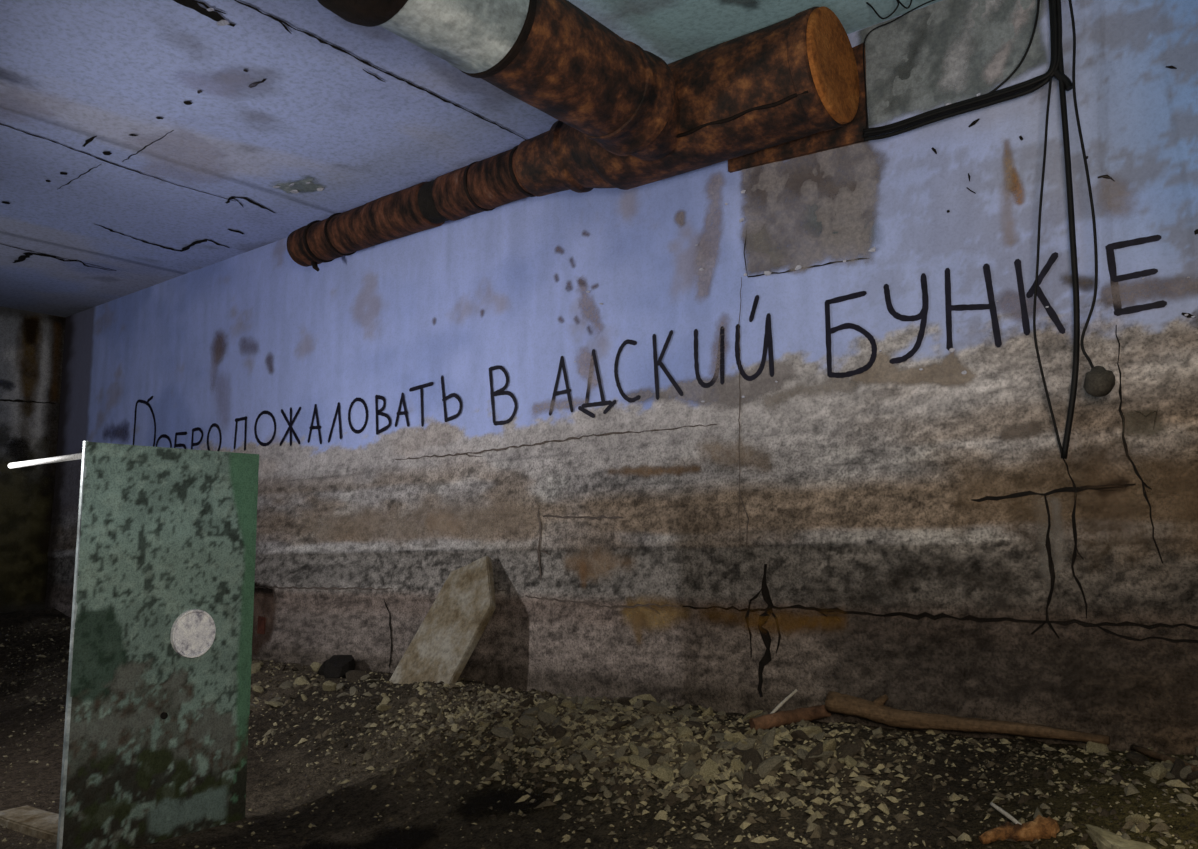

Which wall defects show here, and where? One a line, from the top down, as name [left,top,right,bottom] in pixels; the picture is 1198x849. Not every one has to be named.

crack [173,0,526,140]
rust [481,0,680,161]
crack [2,244,116,271]
crack [0,124,275,252]
spalling [695,141,883,297]
crack [395,230,1198,697]